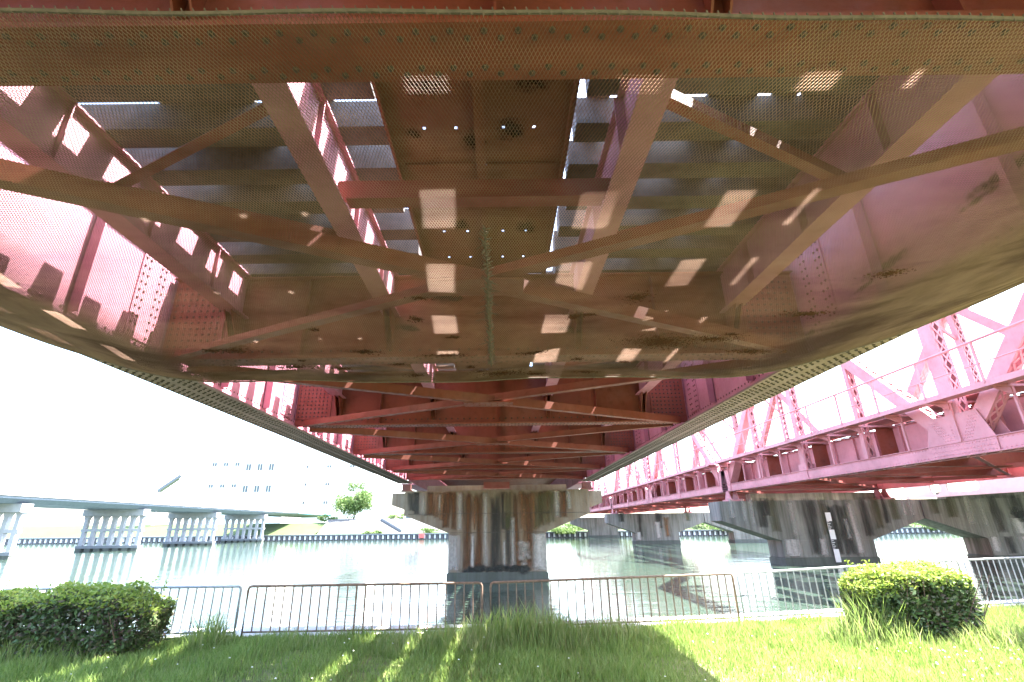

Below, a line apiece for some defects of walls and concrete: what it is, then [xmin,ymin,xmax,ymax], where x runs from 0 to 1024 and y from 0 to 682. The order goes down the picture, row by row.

rust [427,492,482,568]
water stain [471,493,514,568]
rust [513,491,567,567]
water stain [535,492,570,570]
water stain [786,497,913,556]